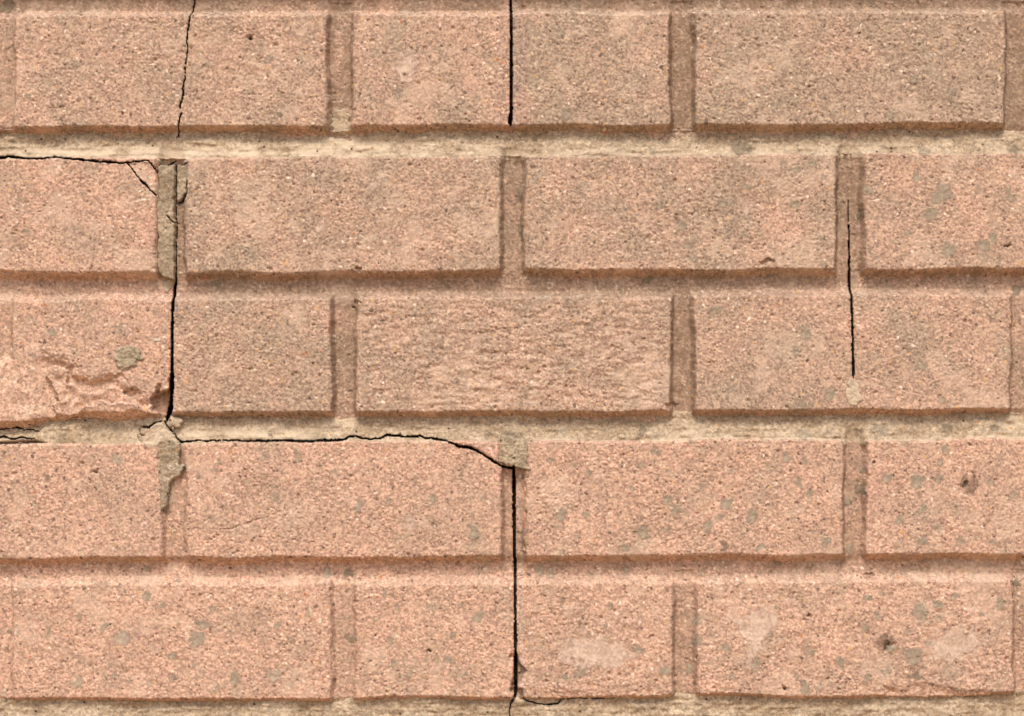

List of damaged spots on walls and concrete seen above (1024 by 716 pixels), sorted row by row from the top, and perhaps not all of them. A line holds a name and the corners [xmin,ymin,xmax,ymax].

spalling [0,350,171,431]
crack [0,0,601,715]
crack [847,209,855,378]